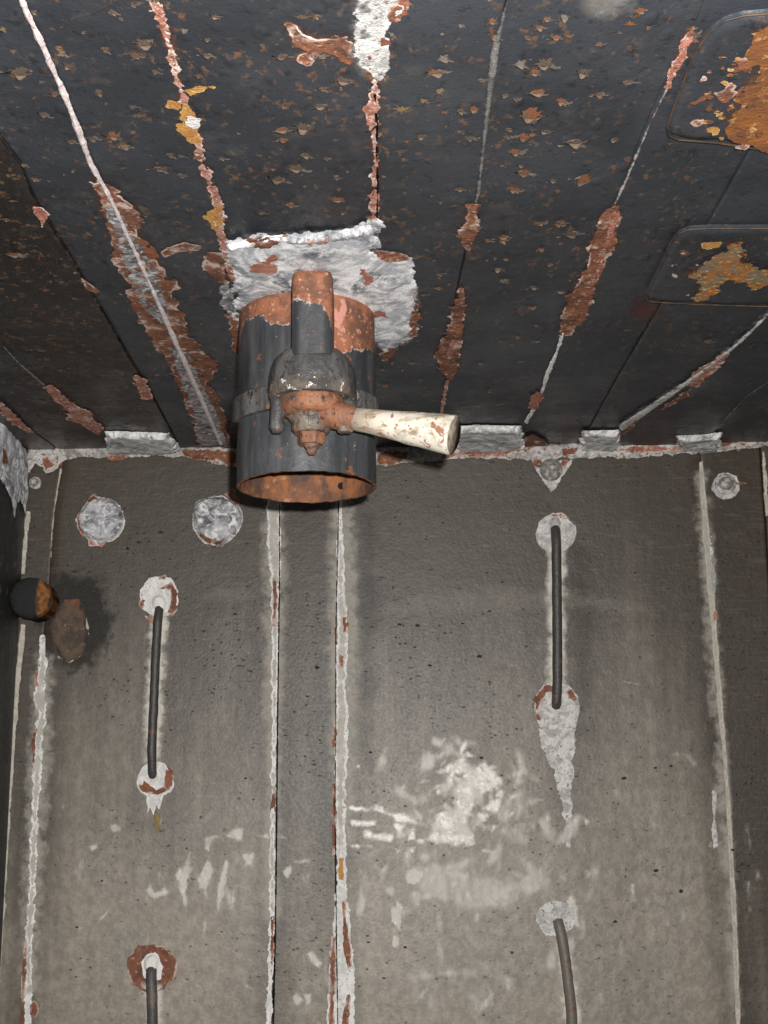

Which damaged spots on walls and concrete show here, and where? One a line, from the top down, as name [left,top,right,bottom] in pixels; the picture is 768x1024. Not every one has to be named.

rust [284,22,354,66]
peeling [661,26,702,89]
rust [689,26,768,154]
rust [88,0,237,467]
peeling [219,283,239,354]
rust [457,203,482,252]
rust [559,204,622,337]
rust [672,239,768,304]
leakage [328,500,416,852]
leakage [22,656,51,992]
leakage [447,834,499,853]
leakage [539,726,576,849]